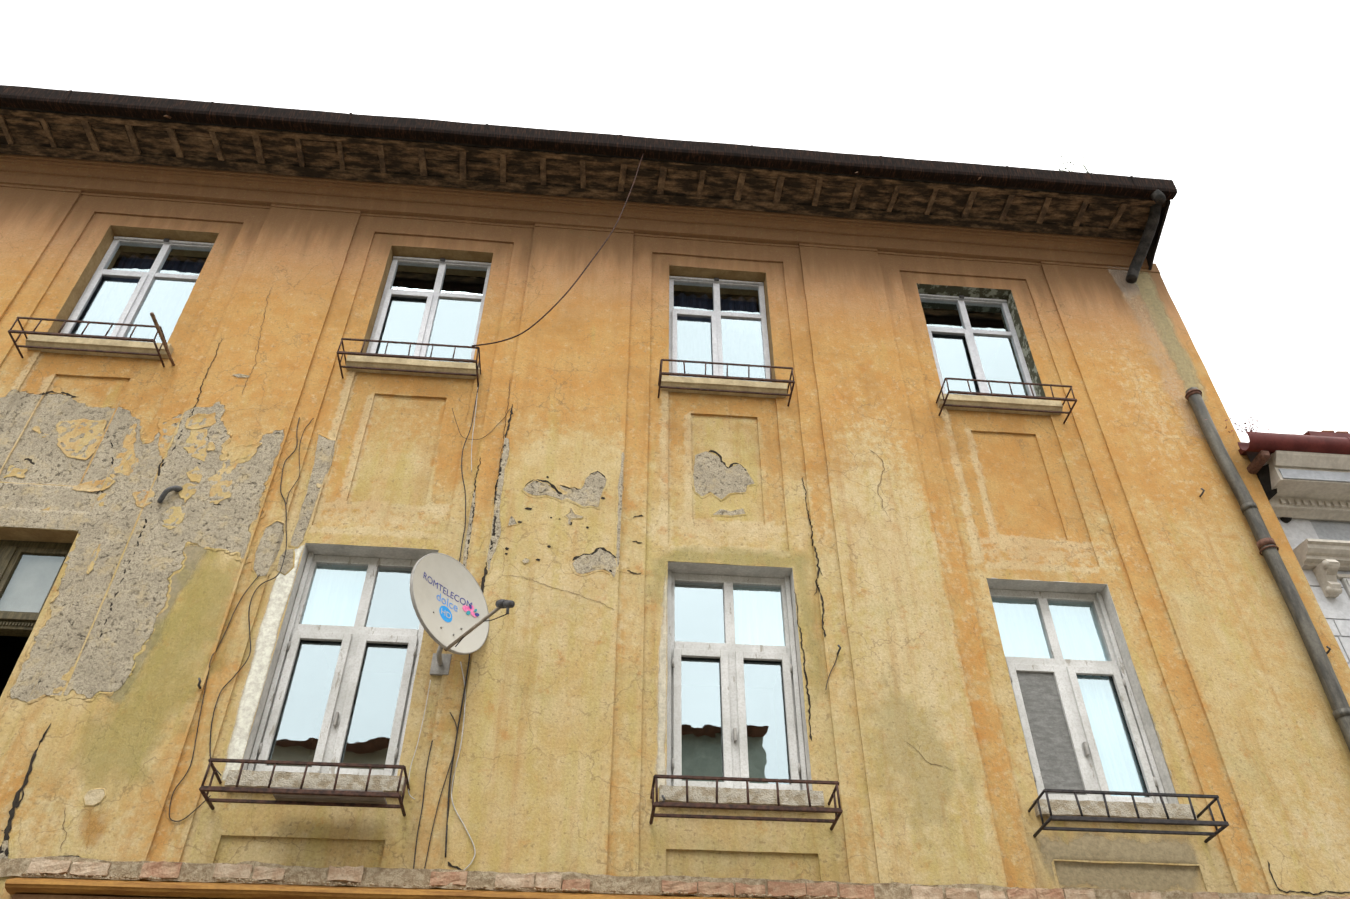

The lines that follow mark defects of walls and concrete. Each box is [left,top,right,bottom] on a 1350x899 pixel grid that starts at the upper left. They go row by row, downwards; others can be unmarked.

peeling [0,387,338,704]
flaking render [461,436,627,580]
peeling [692,450,757,517]